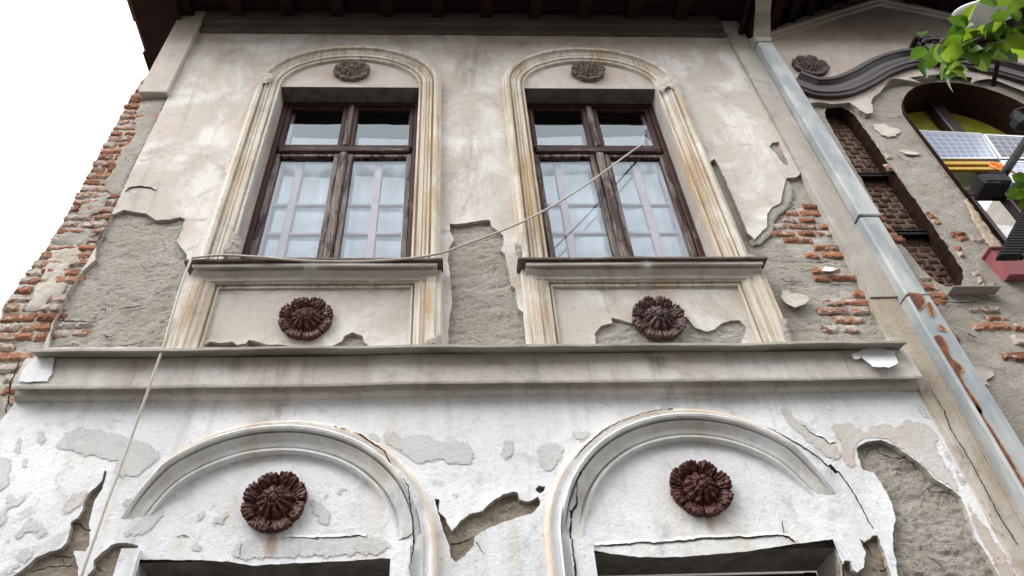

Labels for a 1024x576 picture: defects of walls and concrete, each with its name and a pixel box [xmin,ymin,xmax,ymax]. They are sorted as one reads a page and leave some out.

flaking render [769,142,788,165]
peeling [0,426,164,576]
flaking render [0,71,187,416]
peeling [368,432,475,465]
flaking render [424,220,526,345]
flaking render [435,485,545,562]
flaking render [595,317,747,344]
flaking render [710,159,898,368]
crack [767,422,873,529]
flaking render [781,404,1016,576]
corrosion [907,292,1024,487]
crack [931,389,1018,546]